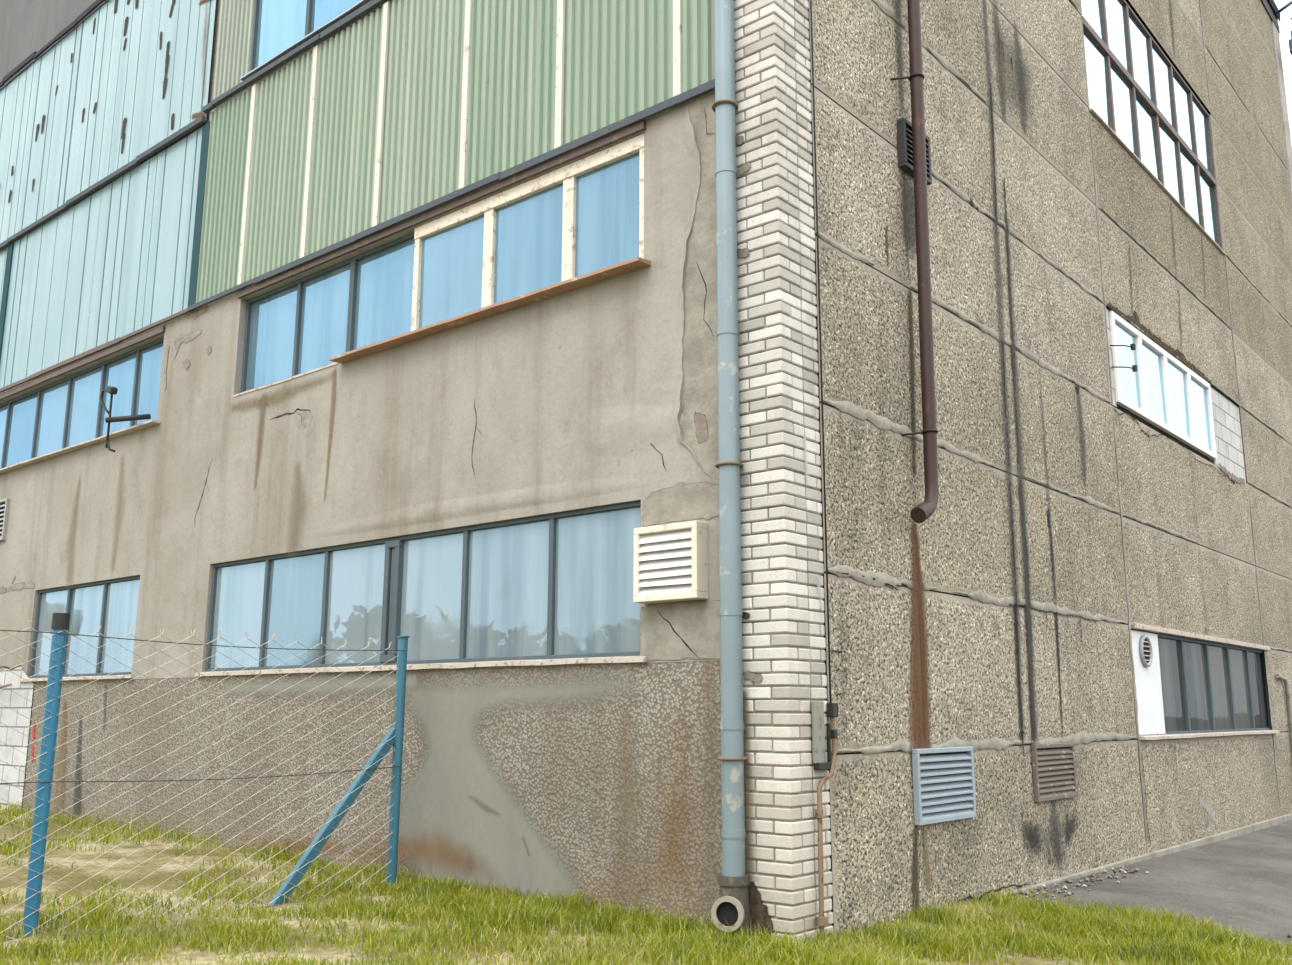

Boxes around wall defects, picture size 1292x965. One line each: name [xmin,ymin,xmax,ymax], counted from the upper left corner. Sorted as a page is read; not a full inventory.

leakage [984,0,1098,755]
crack [1114,408,1227,476]
rust [911,523,931,764]
leakage [1022,800,1078,864]